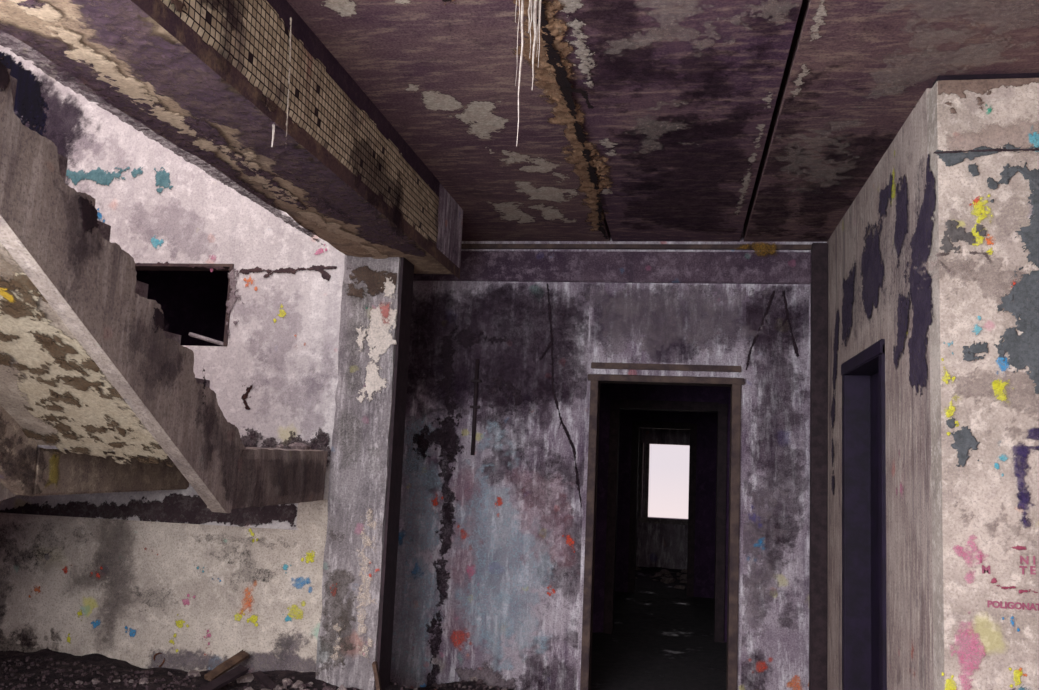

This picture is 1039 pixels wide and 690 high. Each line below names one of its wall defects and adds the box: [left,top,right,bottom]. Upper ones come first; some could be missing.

water stain [0,581,61,653]
peeling [0,248,173,468]
water stain [74,523,130,641]
spalling [0,0,426,403]
crack [135,262,337,281]
crack [422,324,462,686]
rust [513,0,616,232]
crack [537,0,608,239]
water stain [407,285,809,604]
peeling [831,142,1039,494]
crack [934,147,1039,155]